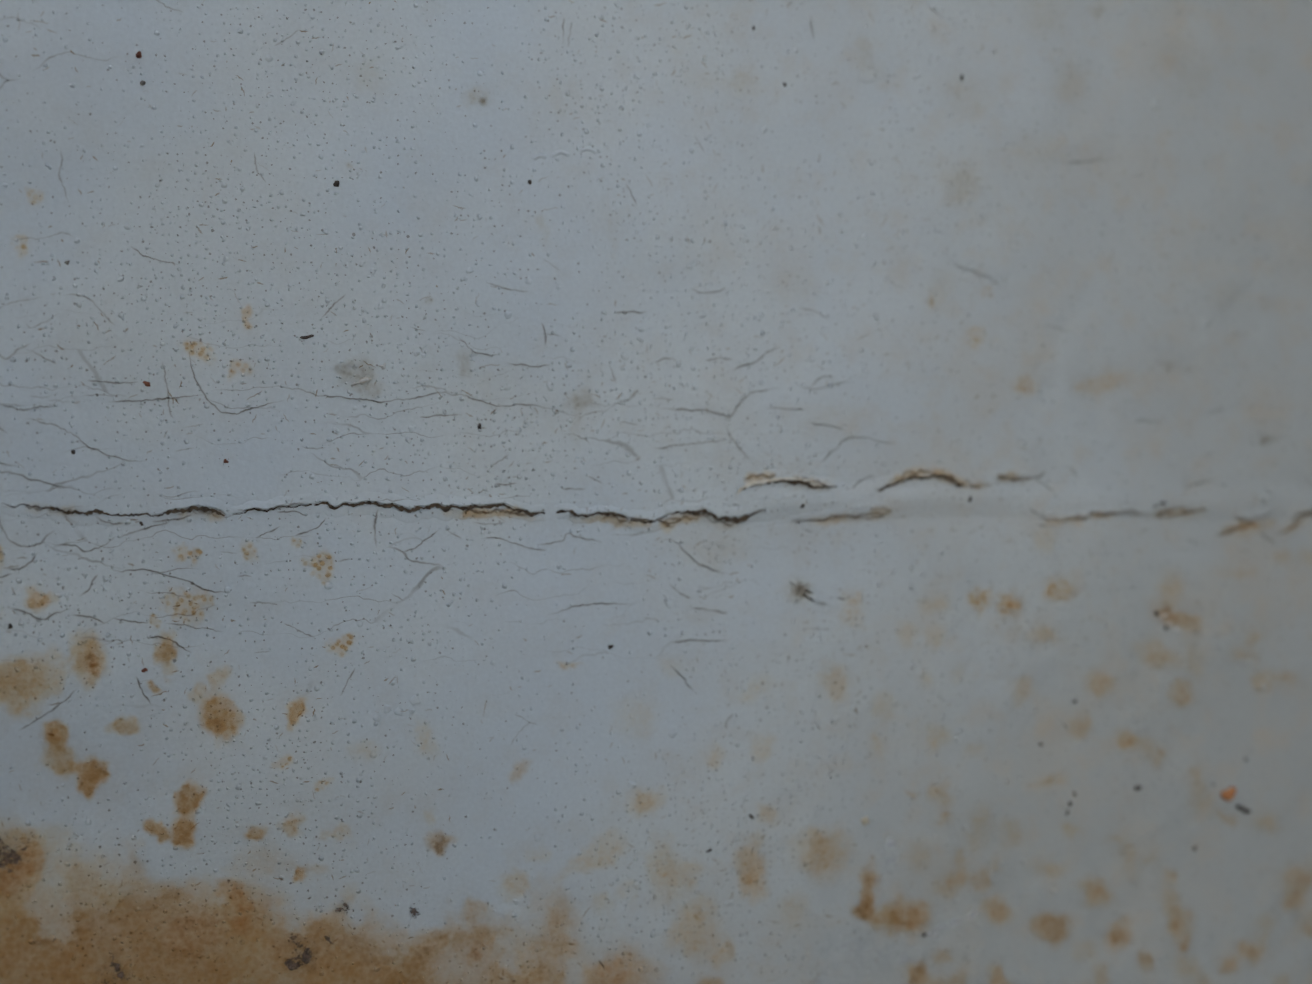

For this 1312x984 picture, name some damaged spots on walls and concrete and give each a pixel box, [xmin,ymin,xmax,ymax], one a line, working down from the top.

crack [1,453,1032,577]
crack [1044,506,1190,522]
crack [1219,503,1312,542]